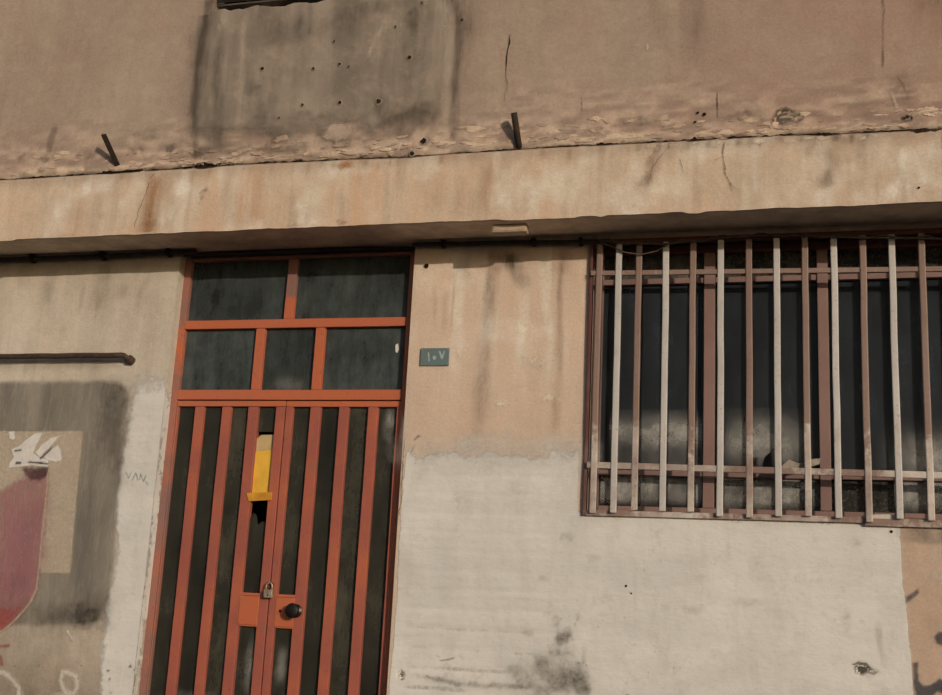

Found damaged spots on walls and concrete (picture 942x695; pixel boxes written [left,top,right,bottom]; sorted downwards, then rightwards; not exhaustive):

flaking render [31,106,942,175]